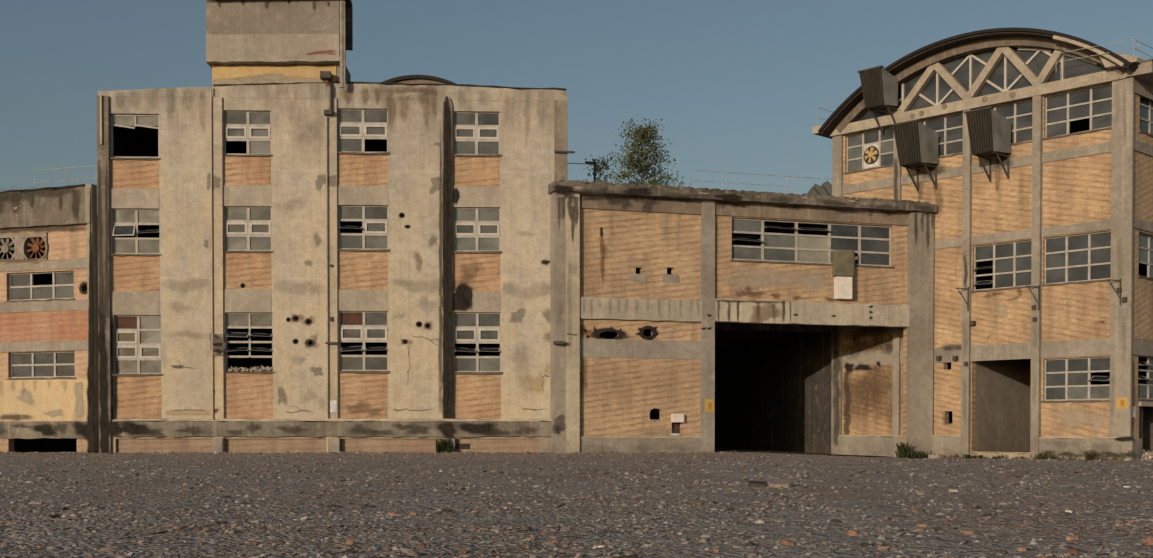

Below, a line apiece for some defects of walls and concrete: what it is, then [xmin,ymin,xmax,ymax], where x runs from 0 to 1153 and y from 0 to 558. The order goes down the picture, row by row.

leakage [554,185,745,240]
leakage [823,163,898,215]
leakage [915,206,934,246]
leakage [351,96,535,442]
leakage [0,167,162,453]
spalling [580,326,659,340]